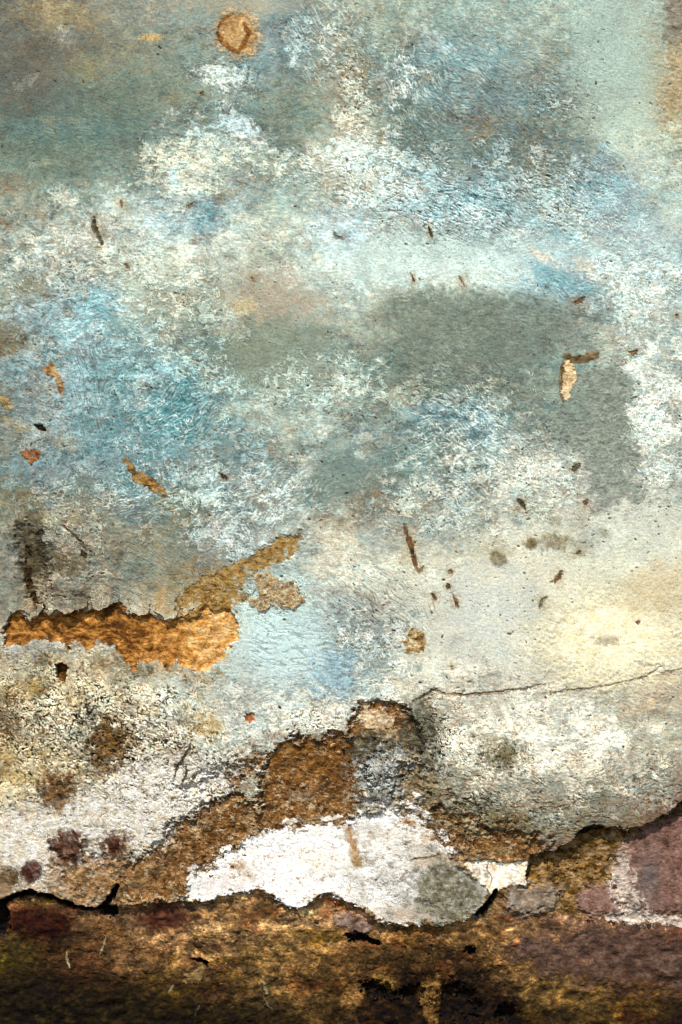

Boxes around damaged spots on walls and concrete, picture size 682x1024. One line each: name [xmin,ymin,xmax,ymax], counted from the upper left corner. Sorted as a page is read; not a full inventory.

peeling [43,361,64,397]
peeling [559,352,599,401]
peeling [122,457,167,497]
damp [546,363,646,512]
damp [2,516,84,598]
flaking render [2,530,306,682]
crack [412,665,682,702]
spalling [0,699,682,1024]